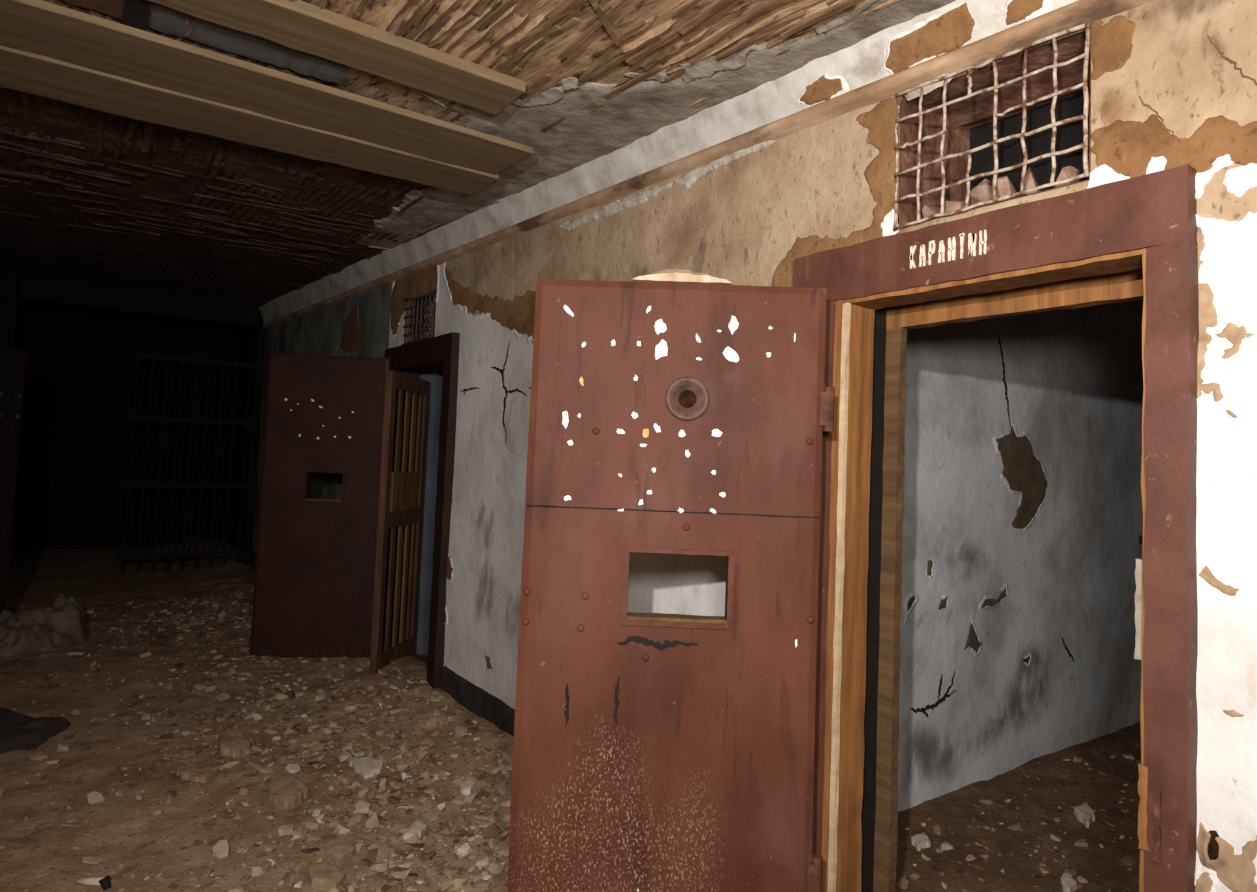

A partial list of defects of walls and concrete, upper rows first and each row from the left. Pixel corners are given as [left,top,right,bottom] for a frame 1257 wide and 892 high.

spalling [355,0,1257,418]
crack [460,341,531,443]
peeling [993,423,1047,531]
peeling [1198,565,1239,596]
peeling [1195,822,1257,892]